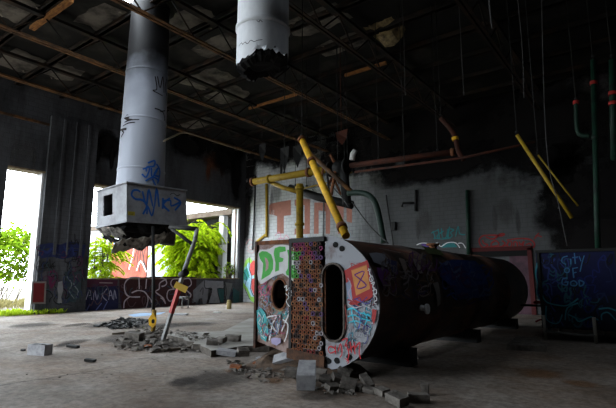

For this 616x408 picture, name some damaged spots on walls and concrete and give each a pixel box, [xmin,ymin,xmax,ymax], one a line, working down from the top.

water stain [317,75,616,250]